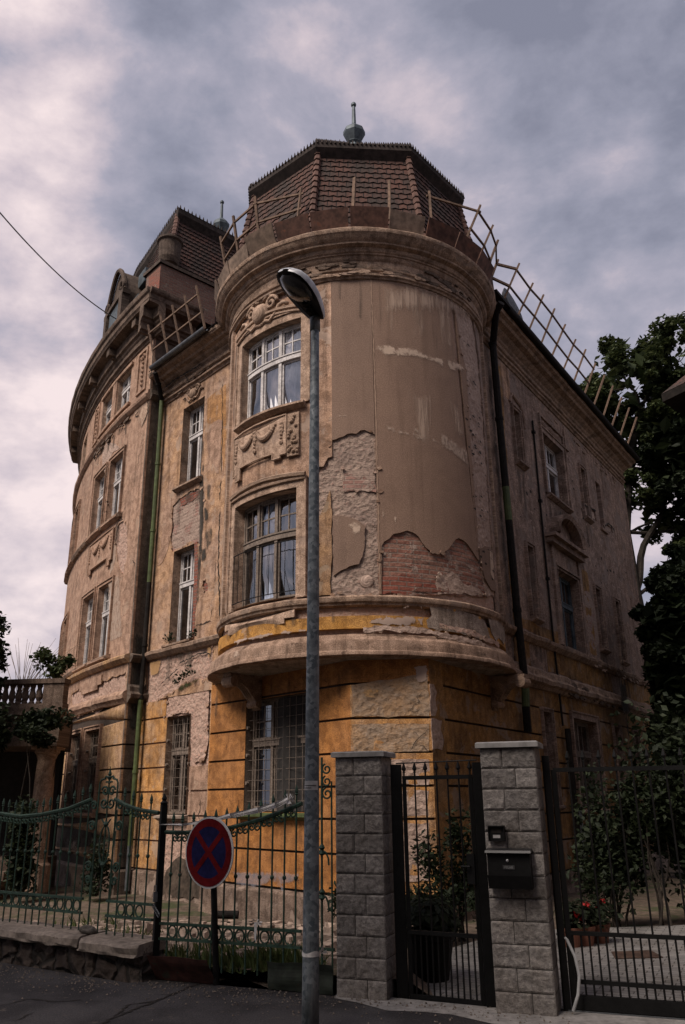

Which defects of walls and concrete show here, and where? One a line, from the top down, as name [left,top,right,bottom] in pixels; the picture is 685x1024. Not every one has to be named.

flaking render [169,487,206,551]
flaking render [300,261,498,634]